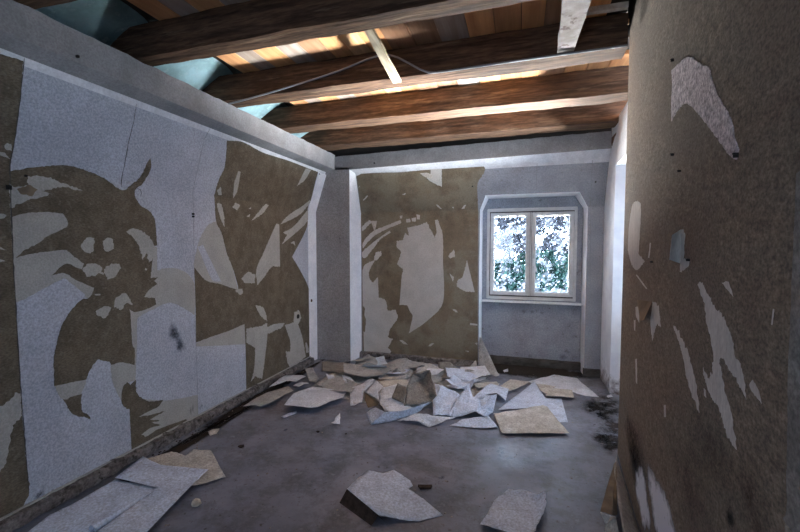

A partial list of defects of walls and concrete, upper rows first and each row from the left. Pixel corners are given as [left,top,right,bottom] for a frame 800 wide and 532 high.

spalling [671,57,740,160]
peeling [0,175,121,302]
peeling [96,187,310,399]
peeling [233,171,269,220]
peeling [362,214,475,353]
peeling [420,169,442,187]
peeling [0,392,24,472]
peeling [55,380,86,400]
peeling [140,395,198,437]
spalling [783,171,800,532]